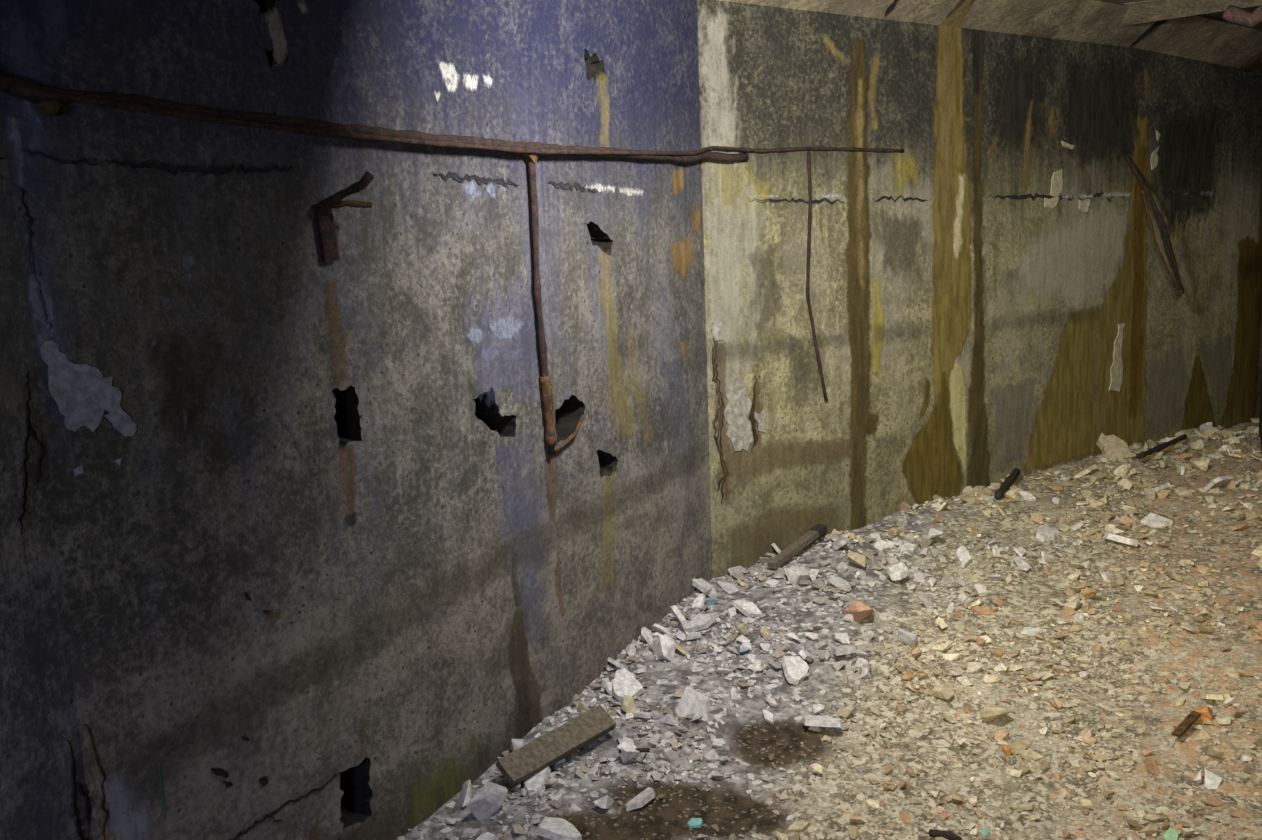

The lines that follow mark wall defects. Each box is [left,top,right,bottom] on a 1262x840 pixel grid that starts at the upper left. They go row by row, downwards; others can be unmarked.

water stain [701,13,778,408]
water stain [903,0,1262,505]
water stain [718,36,883,567]
peeling [29,273,137,436]
peeling [1109,323,1125,392]
hole [473,387,517,437]
hole [555,395,586,443]
peeling [949,360,967,471]
spalling [596,449,618,477]
crack [231,772,341,840]
hole [340,758,373,829]